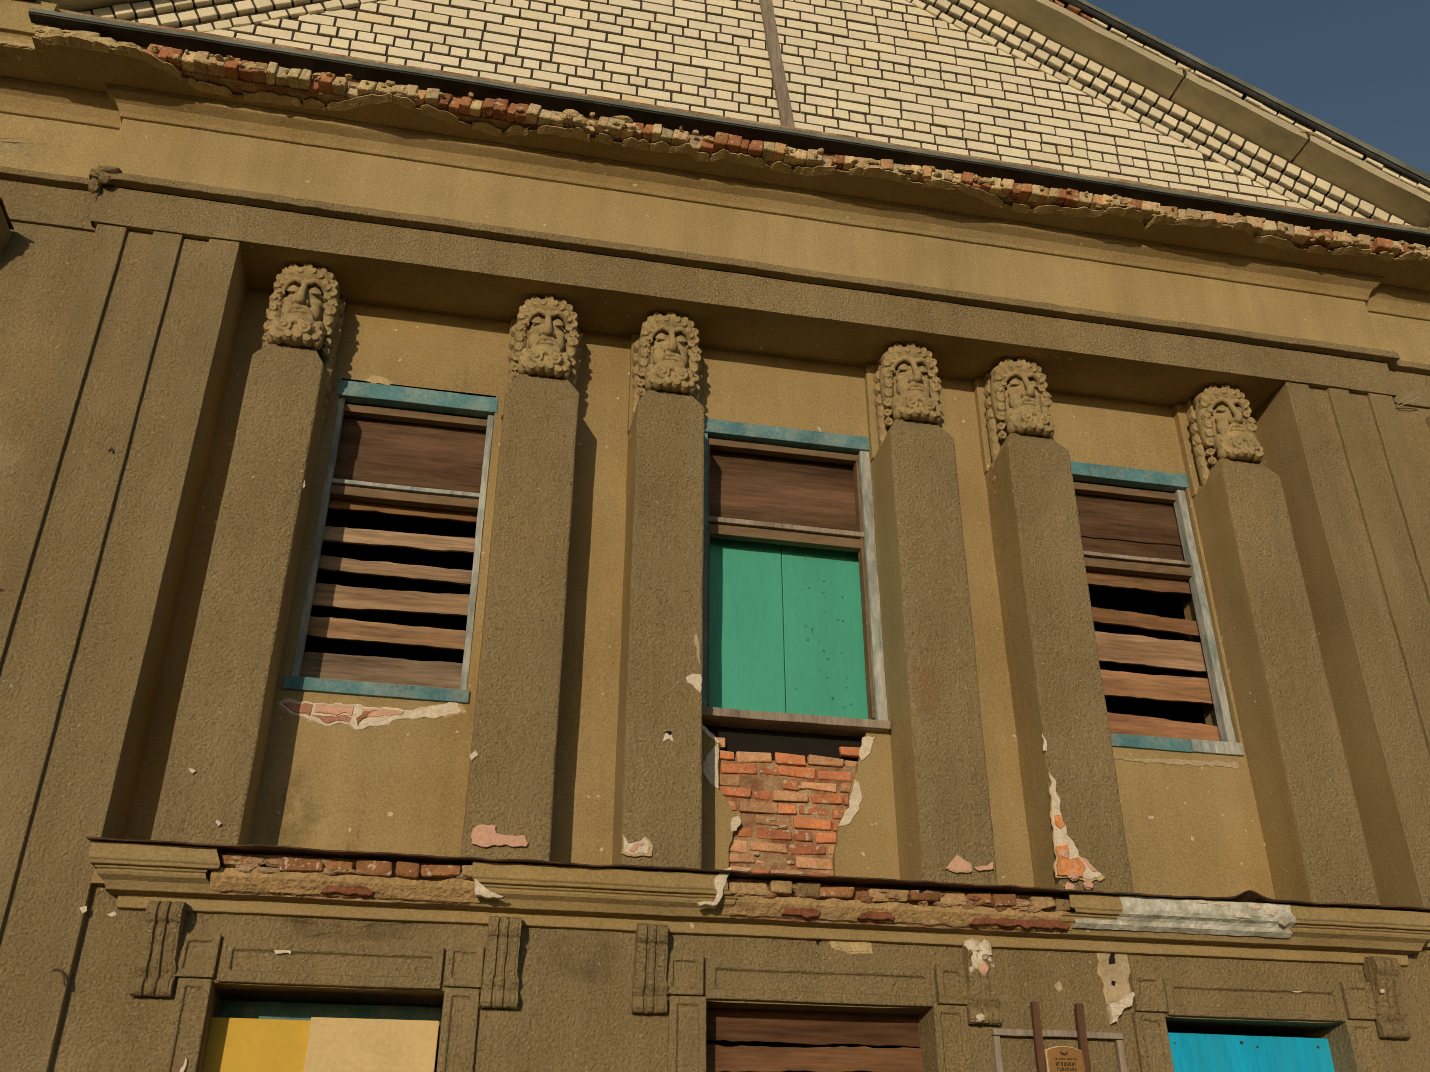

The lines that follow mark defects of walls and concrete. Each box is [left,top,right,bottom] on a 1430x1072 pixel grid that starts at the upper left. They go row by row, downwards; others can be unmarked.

spalling [0,25,1430,262]
spalling [275,698,466,731]
peeling [471,824,528,848]
spalling [621,834,653,857]
spalling [696,725,1296,976]
spalling [210,855,505,906]
spalling [1096,953,1135,1025]